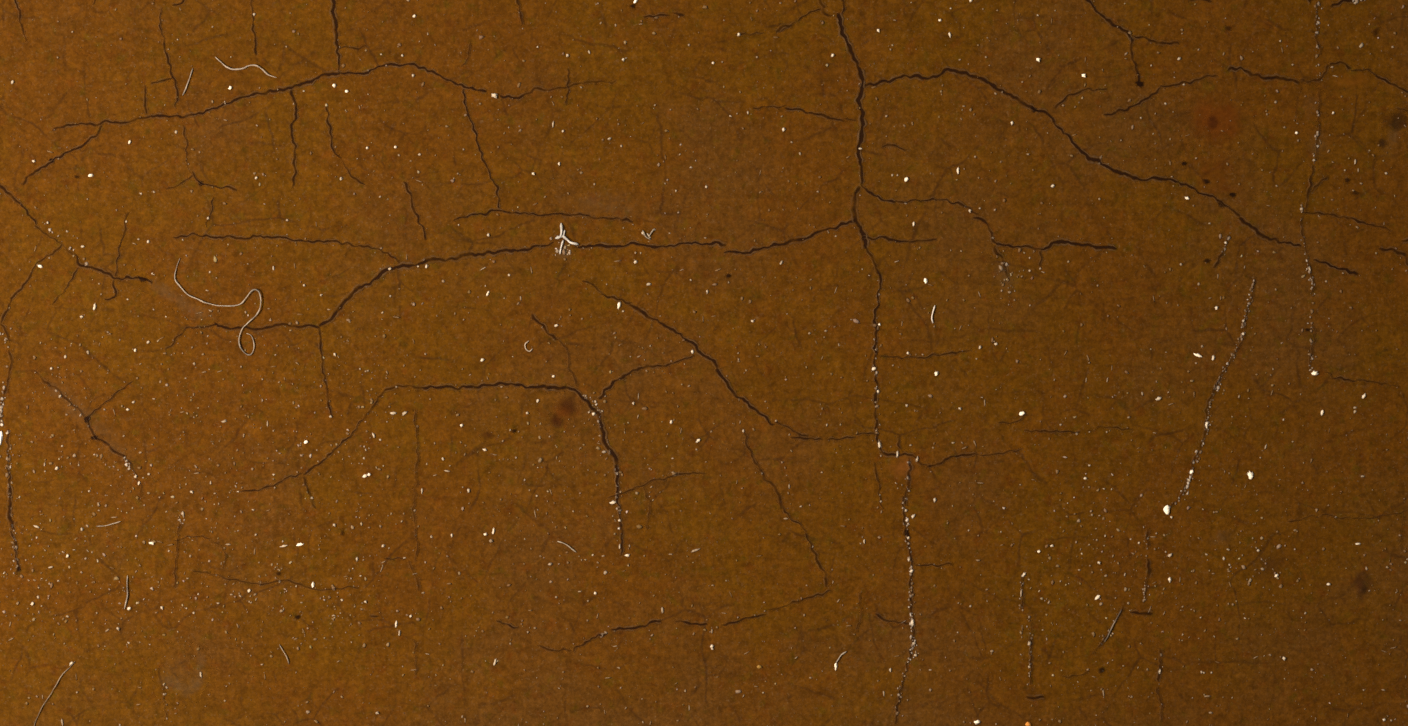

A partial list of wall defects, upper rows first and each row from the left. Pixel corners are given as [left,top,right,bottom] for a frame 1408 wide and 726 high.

crack [174,513,377,617]
crack [0,0,633,575]
crack [421,0,1408,721]